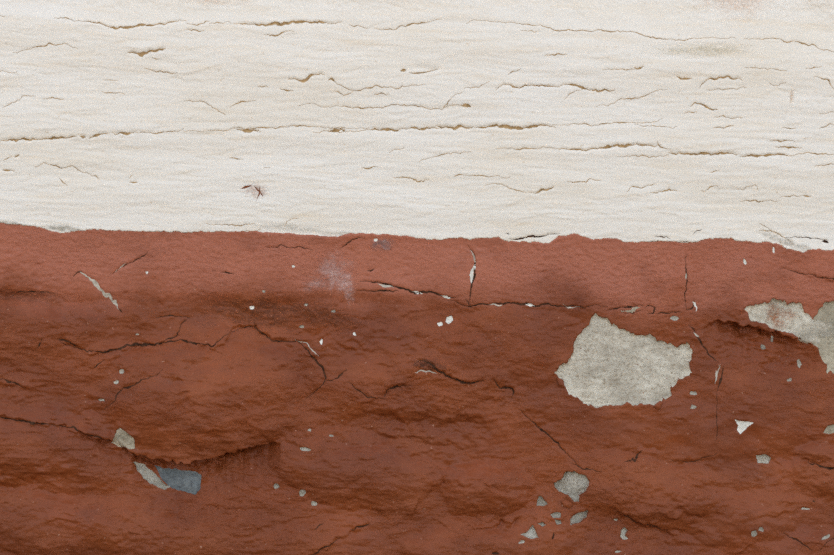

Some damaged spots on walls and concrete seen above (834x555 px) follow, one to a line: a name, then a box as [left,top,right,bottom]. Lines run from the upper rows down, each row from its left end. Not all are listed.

crack [58,17,438,36]
crack [1,20,833,193]
crack [741,185,810,202]
crack [759,223,829,246]
crack [73,271,122,312]
peeling [745,298,834,374]
peeling [555,313,693,410]
crack [37,315,599,472]
crack [0,417,102,439]
peeling [112,428,135,449]
peeling [133,462,201,495]
peeling [519,471,589,544]